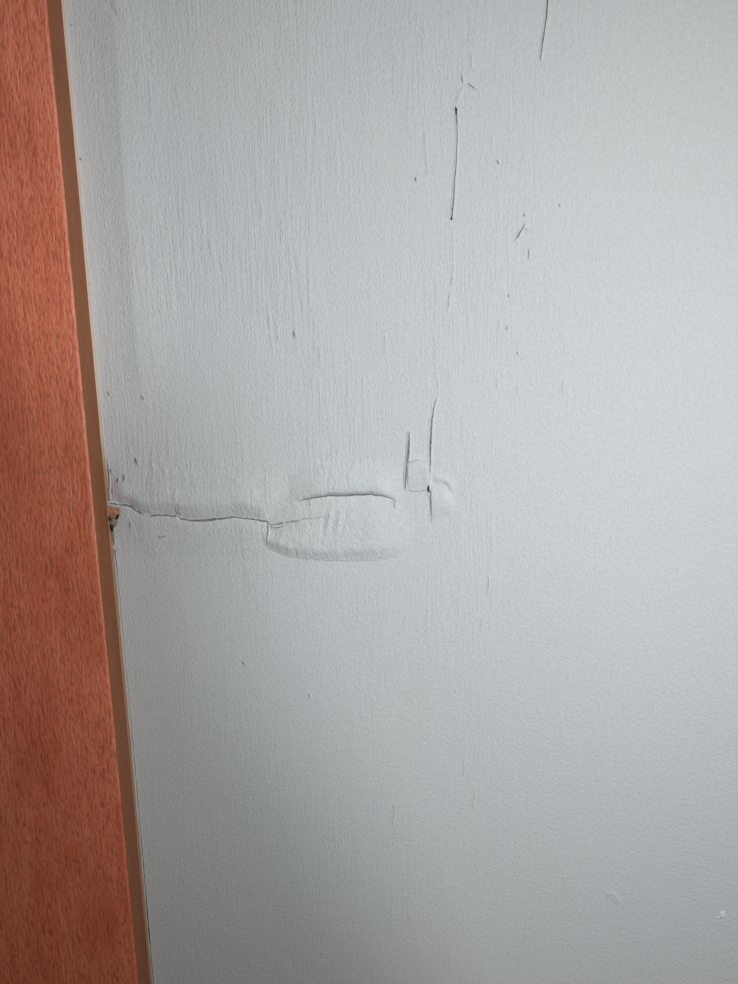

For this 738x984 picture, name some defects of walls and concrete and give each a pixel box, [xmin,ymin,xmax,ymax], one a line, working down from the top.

crack [106,396,439,984]